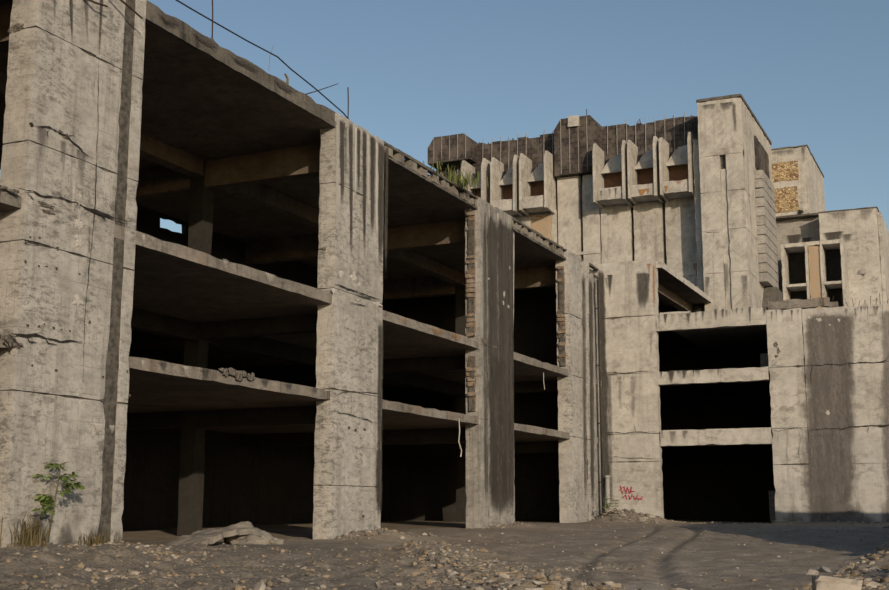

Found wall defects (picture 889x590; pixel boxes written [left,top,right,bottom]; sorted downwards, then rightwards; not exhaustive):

crack [4,73,133,374]
leakage [336,121,388,258]
spalling [0,334,24,349]
leakage [483,211,514,509]
leakage [804,316,870,523]
crack [810,357,889,384]